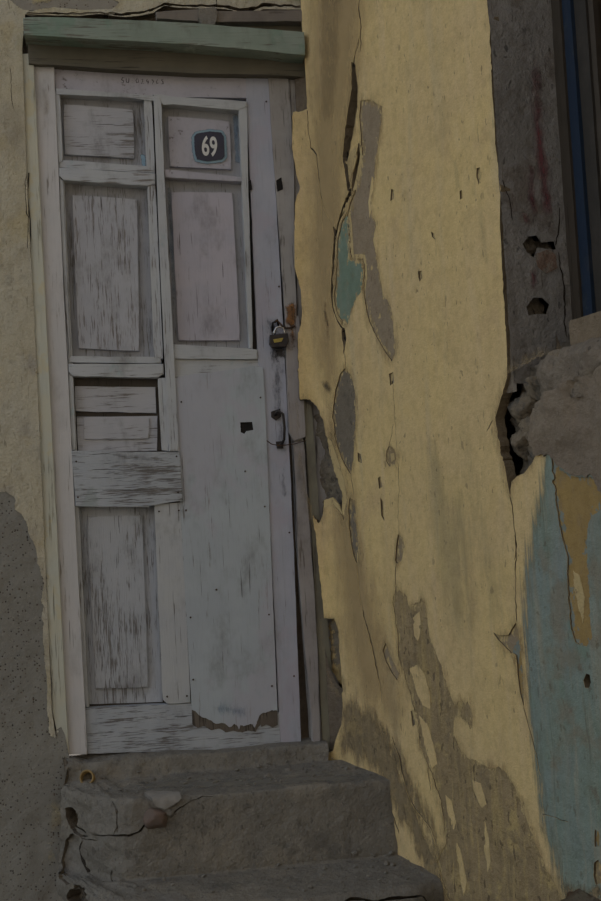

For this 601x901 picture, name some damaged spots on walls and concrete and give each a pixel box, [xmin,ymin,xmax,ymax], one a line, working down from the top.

crack [214,0,273,11]
damp [317,0,356,351]
crack [335,146,358,242]
flaking render [333,100,395,360]
flaking render [314,370,364,564]
peeling [553,461,601,646]
flaking render [0,492,90,901]
crack [79,835,91,872]
crack [346,893,417,901]
damp [341,700,444,895]